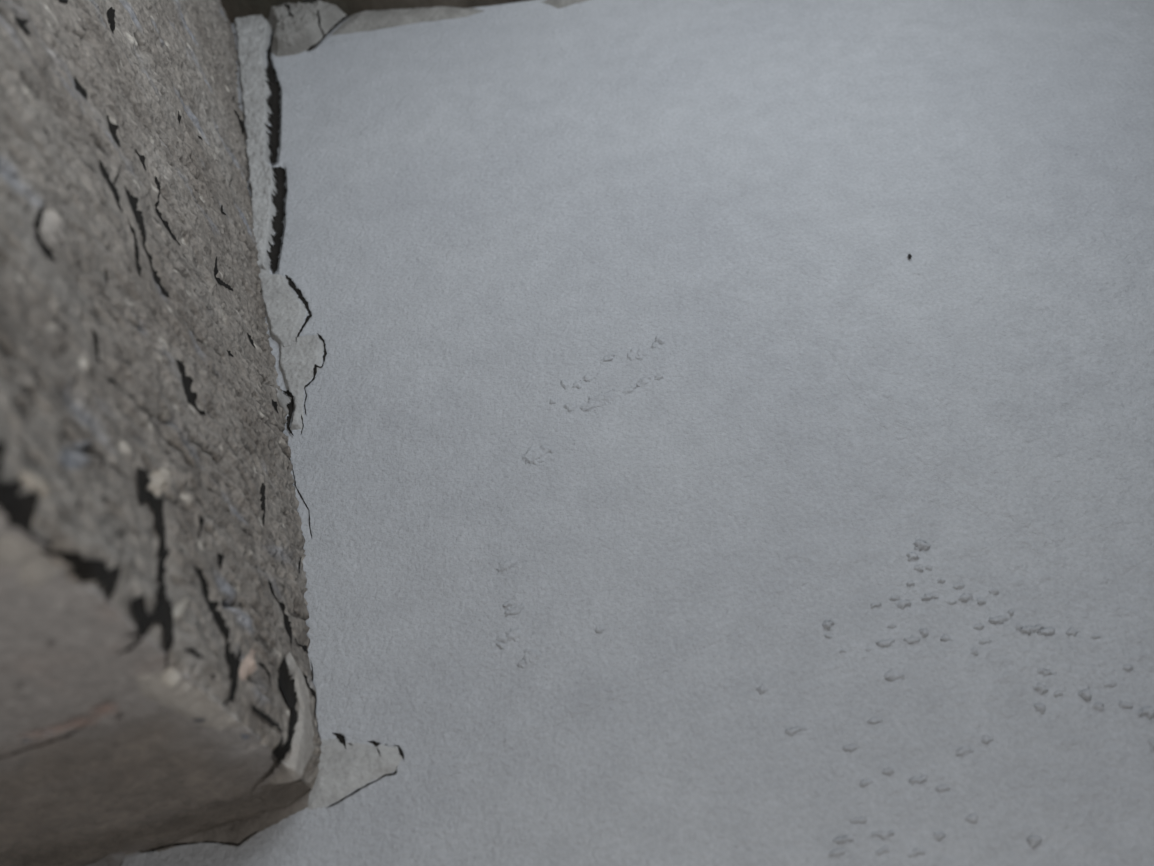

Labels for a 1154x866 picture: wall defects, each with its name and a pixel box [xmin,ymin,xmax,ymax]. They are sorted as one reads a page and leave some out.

crack [107,7,115,33]
crack [74,76,181,297]
crack [33,206,73,272]
flaking render [41,209,66,245]
crack [232,3,349,573]
crack [176,359,206,415]
flaking render [148,467,171,496]
spalling [0,535,59,589]
crack [0,442,404,807]
flaking render [239,648,257,681]
spalling [136,667,250,739]
spalling [144,779,311,852]